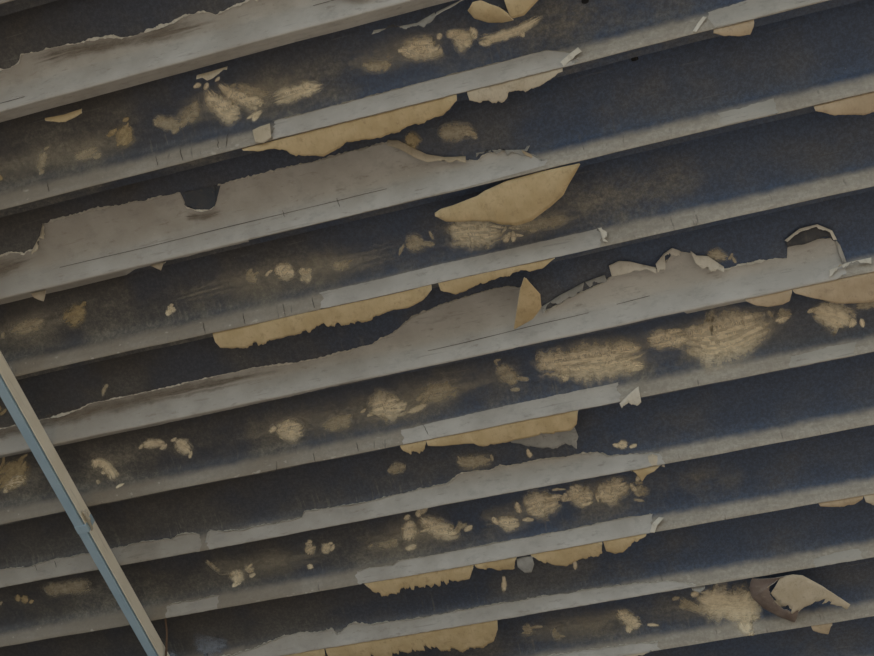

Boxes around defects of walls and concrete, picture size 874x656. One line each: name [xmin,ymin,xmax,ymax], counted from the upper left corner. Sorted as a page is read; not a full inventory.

peeling [0,0,538,122]
peeling [718,98,778,126]
peeling [814,92,874,116]
peeling [0,48,582,305]
peeling [39,224,874,447]
peeling [0,425,32,458]
peeling [111,382,665,565]
peeling [819,494,874,507]
peeling [0,553,98,588]
peeling [222,580,698,656]
peeling [355,514,663,596]
peeling [749,574,850,622]